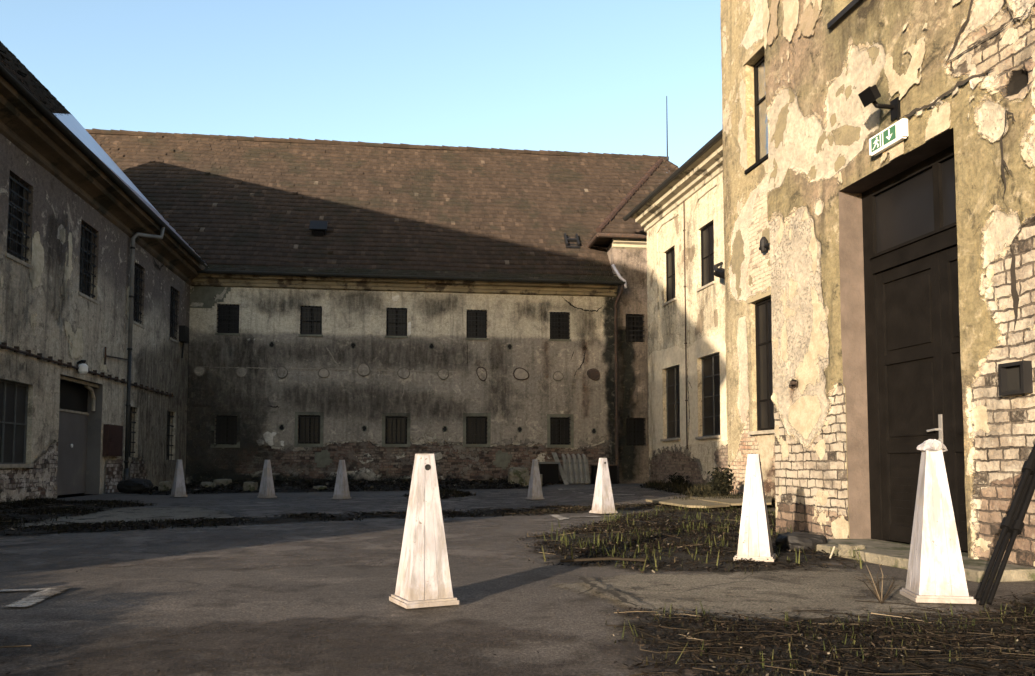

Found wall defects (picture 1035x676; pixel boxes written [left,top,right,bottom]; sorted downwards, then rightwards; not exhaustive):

peeling [925,101,951,141]
flaking render [943,0,1035,167]
flaking render [649,0,928,539]
damp [132,338,465,485]